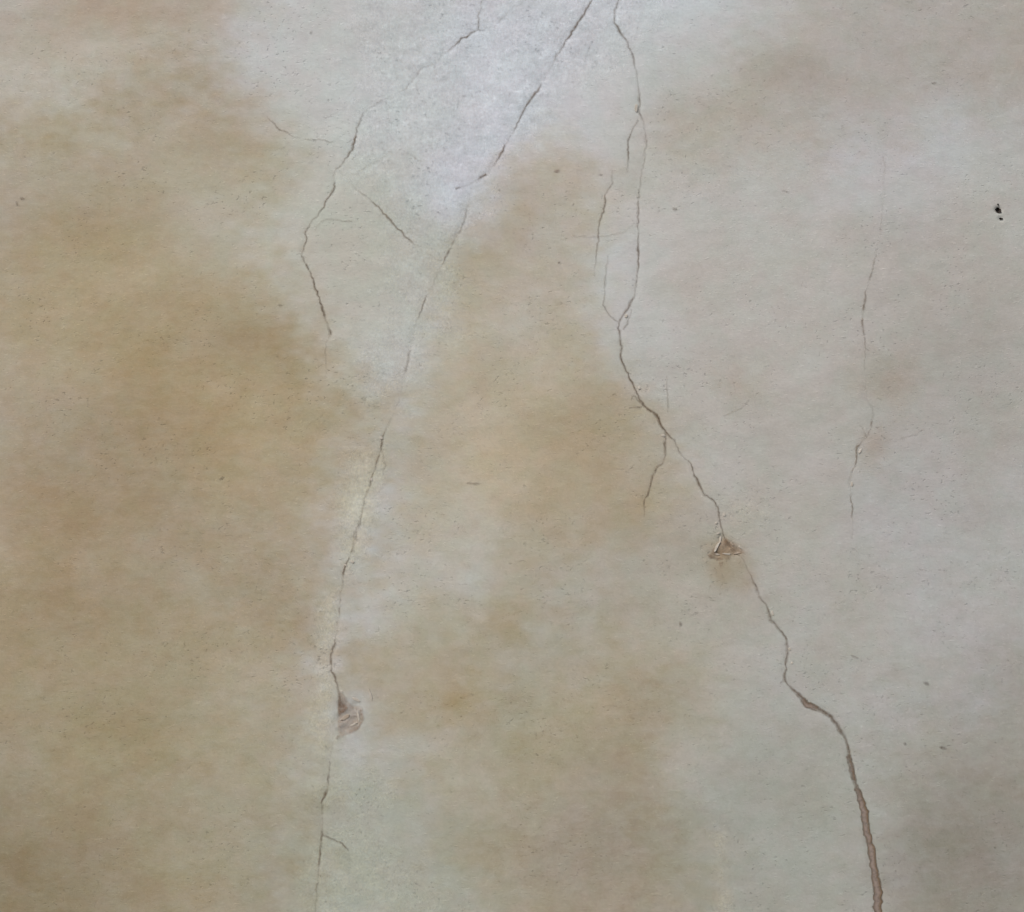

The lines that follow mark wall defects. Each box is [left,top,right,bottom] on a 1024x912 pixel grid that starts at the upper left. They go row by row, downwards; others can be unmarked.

crack [619,314,668,444]
crack [768,610,883,912]